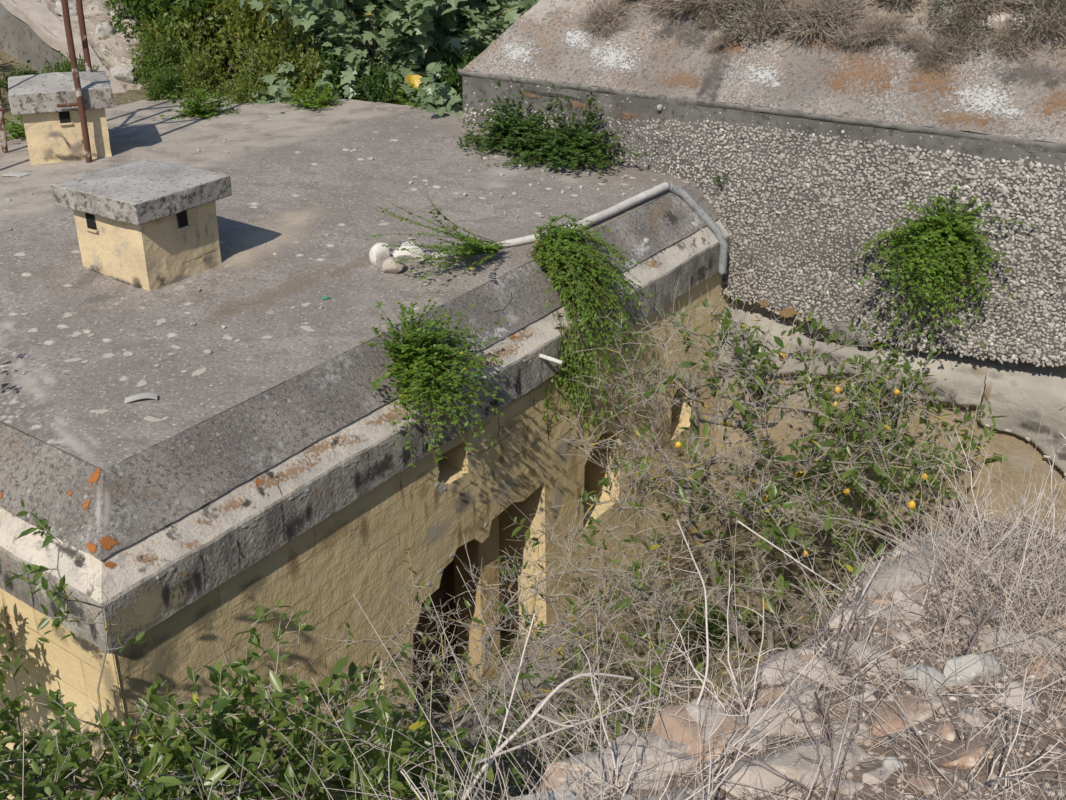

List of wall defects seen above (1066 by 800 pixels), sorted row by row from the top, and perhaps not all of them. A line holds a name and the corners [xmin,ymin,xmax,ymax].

water stain [355,449,409,488]
water stain [285,506,312,541]